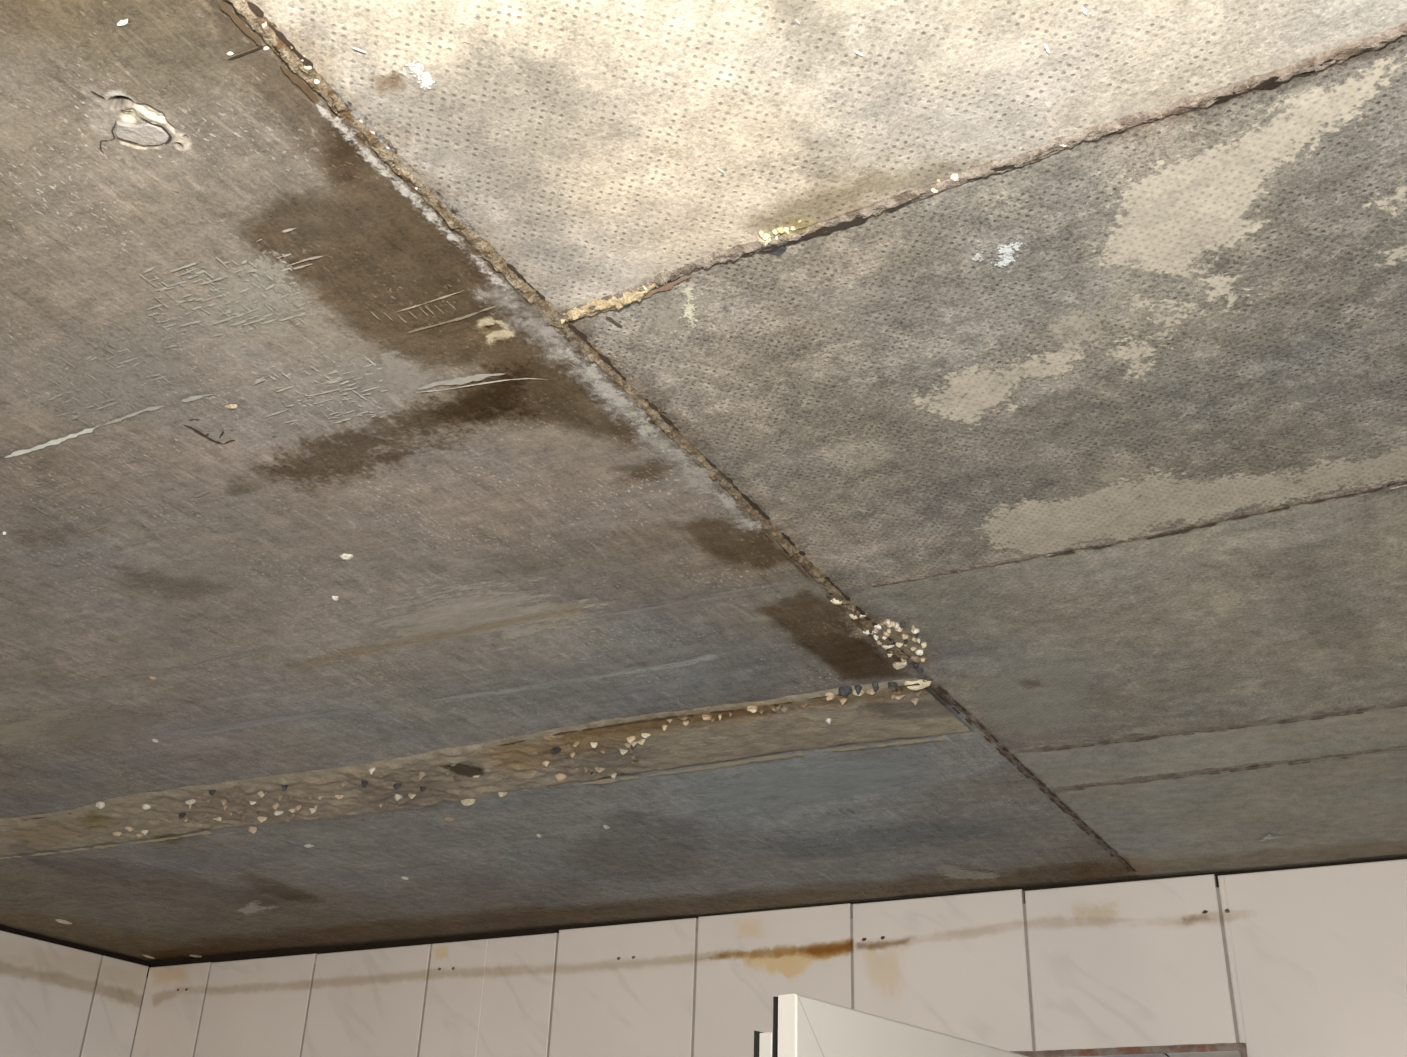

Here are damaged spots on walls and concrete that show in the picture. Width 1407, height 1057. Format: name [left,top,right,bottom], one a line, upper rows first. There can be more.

spalling [17,41,255,189]
leakage [316,85,471,241]
leakage [471,255,762,530]